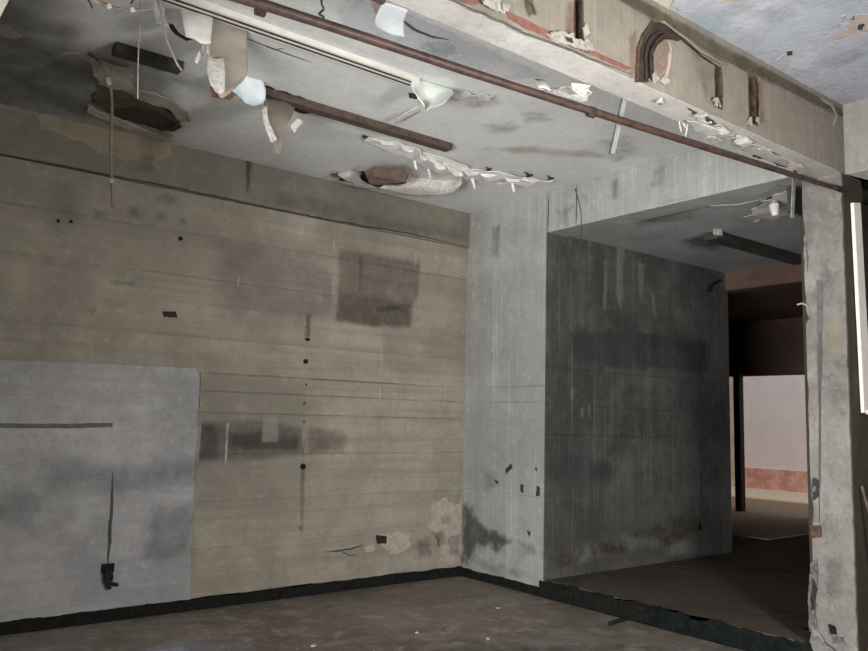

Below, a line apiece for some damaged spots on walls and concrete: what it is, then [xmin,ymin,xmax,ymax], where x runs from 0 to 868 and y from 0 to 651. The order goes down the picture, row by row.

peeling [372,2,408,38]
spalling [458,0,727,84]
peeling [831,14,868,42]
spalling [33,52,190,166]
peeling [152,0,309,155]
flaking render [330,135,554,197]
peeling [678,108,821,178]
water stain [462,506,506,561]
spalling [808,558,834,651]